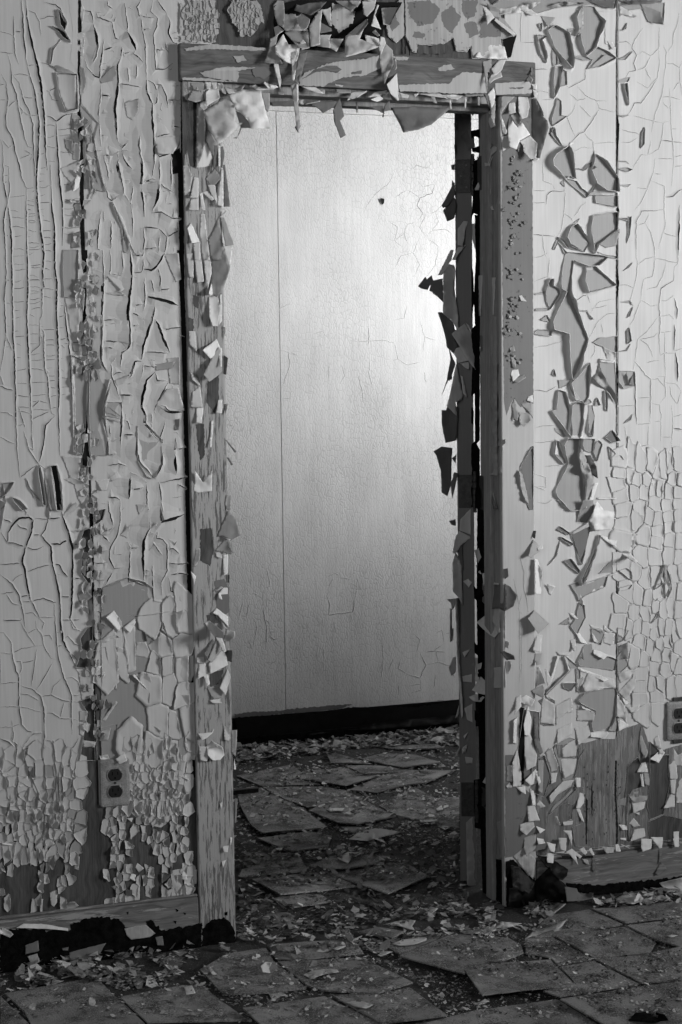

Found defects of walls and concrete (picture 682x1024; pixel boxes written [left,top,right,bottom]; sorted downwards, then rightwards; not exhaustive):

crack [0,0,189,778]
peeling [0,0,352,963]
peeling [155,0,682,909]
crack [566,13,682,448]